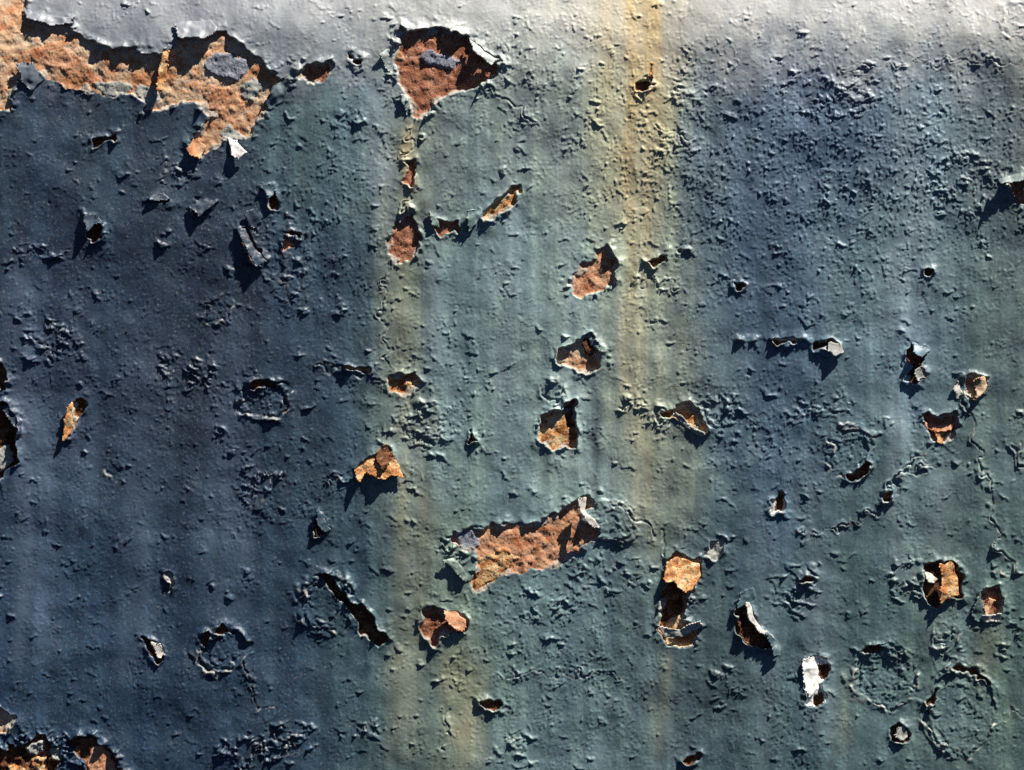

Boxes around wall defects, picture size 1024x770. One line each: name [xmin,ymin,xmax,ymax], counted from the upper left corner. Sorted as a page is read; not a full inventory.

peeling [0,0,513,168]
peeling [379,153,527,271]
peeling [555,238,626,305]
peeling [549,328,612,382]
peeling [530,395,583,455]
peeling [916,369,996,452]
peeling [311,566,394,655]
peeling [415,487,609,657]
peeling [651,531,730,655]
peeling [730,587,786,656]
peeling [915,553,1011,630]
peeling [796,648,835,719]